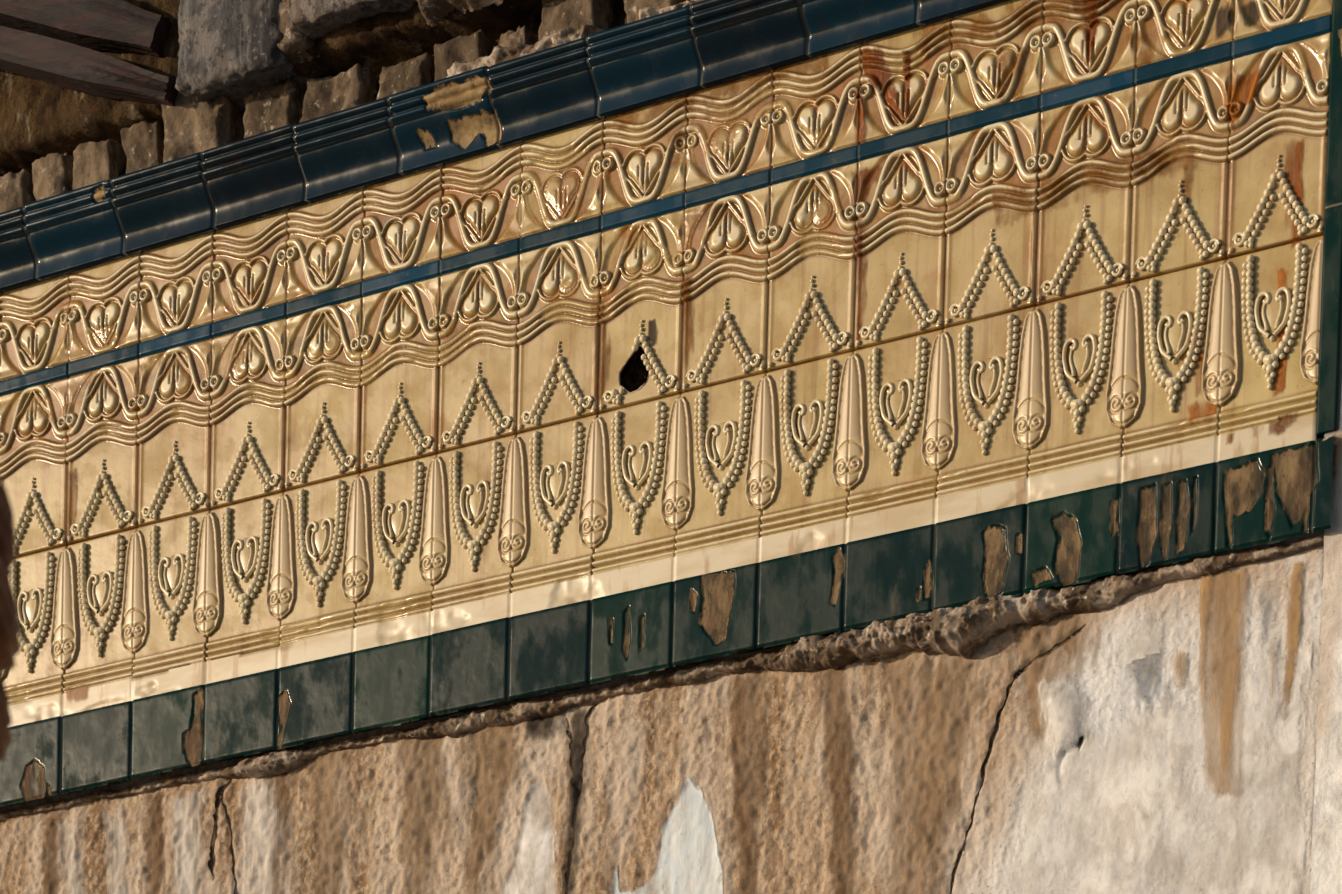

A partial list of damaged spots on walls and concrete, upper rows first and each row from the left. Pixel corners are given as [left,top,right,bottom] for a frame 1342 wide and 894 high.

spalling [423,75,502,149]
corrosion [855,167,880,200]
corrosion [855,221,867,340]
spalling [621,320,656,392]
spalling [689,571,734,644]
spalling [983,526,1022,597]
spalling [1136,482,1197,567]
spalling [1224,445,1316,543]
crack [208,779,236,894]
crack [565,704,597,894]
crack [950,625,1085,894]
peeling [1005,640,1312,894]